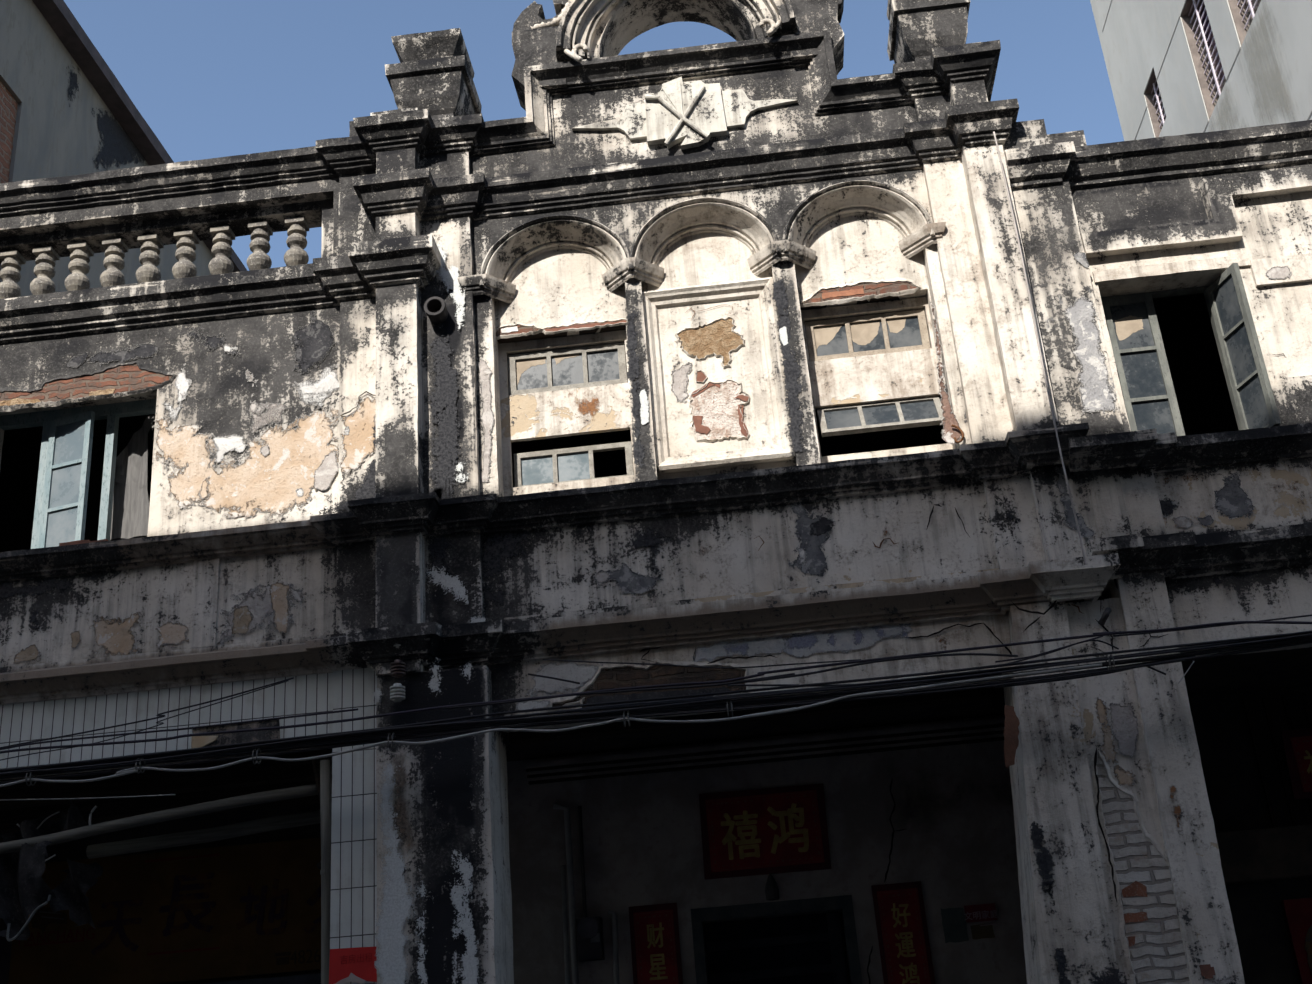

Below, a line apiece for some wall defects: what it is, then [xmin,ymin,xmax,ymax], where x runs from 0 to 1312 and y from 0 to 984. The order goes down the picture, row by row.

flaking render [0,311,376,519]
leakage [427,335,461,499]
spalling [671,317,750,442]
flaking render [70,609,145,656]
flaking render [217,582,307,646]
flaking render [593,561,664,596]
spalling [516,623,913,712]
flaking render [789,502,835,583]
crack [909,579,1168,654]
spalling [1003,705,1020,768]
leakage [393,755,415,850]
spalling [1090,696,1238,984]